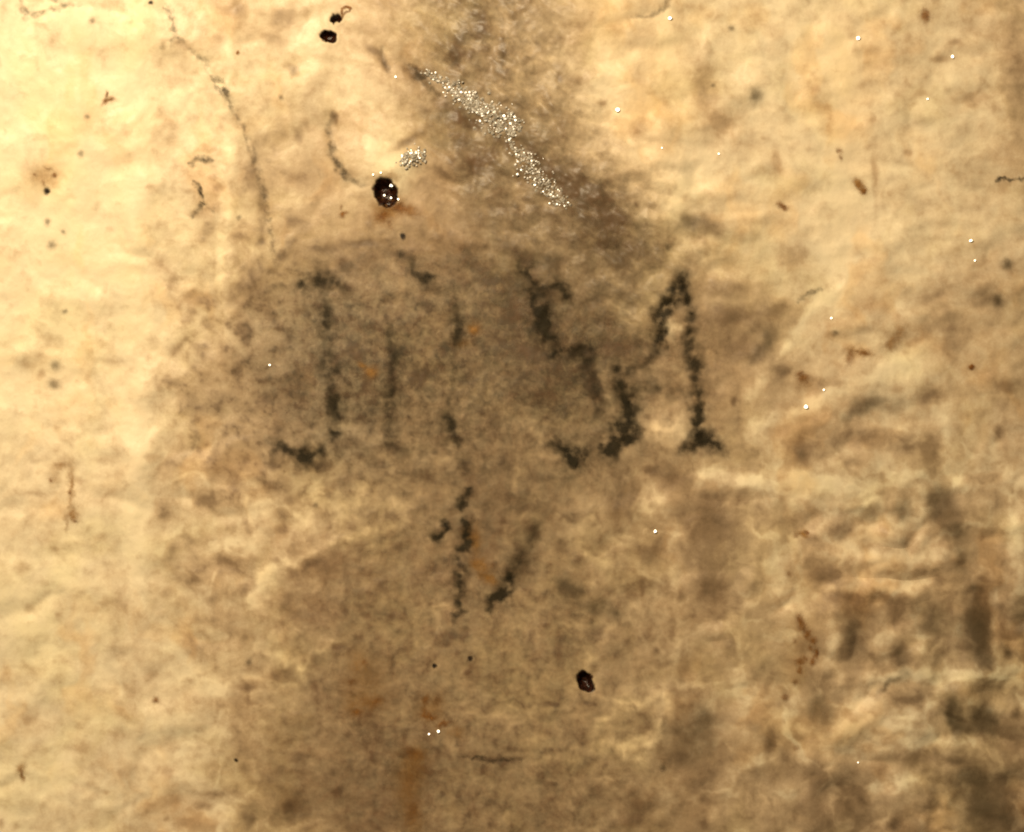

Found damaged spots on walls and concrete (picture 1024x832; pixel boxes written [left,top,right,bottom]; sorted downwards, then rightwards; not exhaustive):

water stain [436,0,660,278]
water stain [310,492,607,832]
corrosion [797,617,818,673]